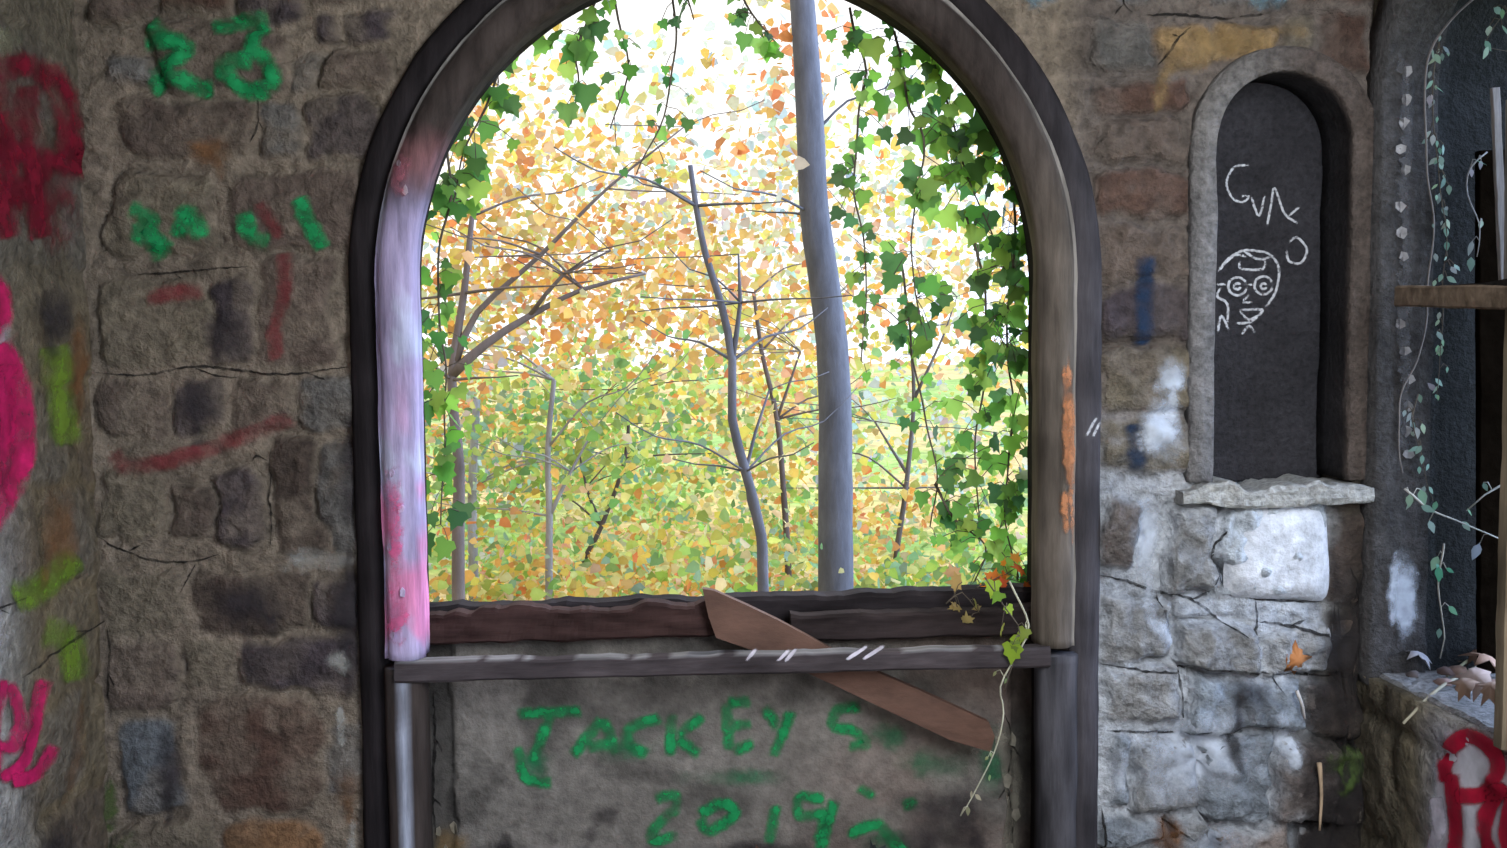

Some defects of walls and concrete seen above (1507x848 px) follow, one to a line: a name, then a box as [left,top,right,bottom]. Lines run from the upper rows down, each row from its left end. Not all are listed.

corrosion [1061,366,1075,531]
crack [1101,532,1359,735]